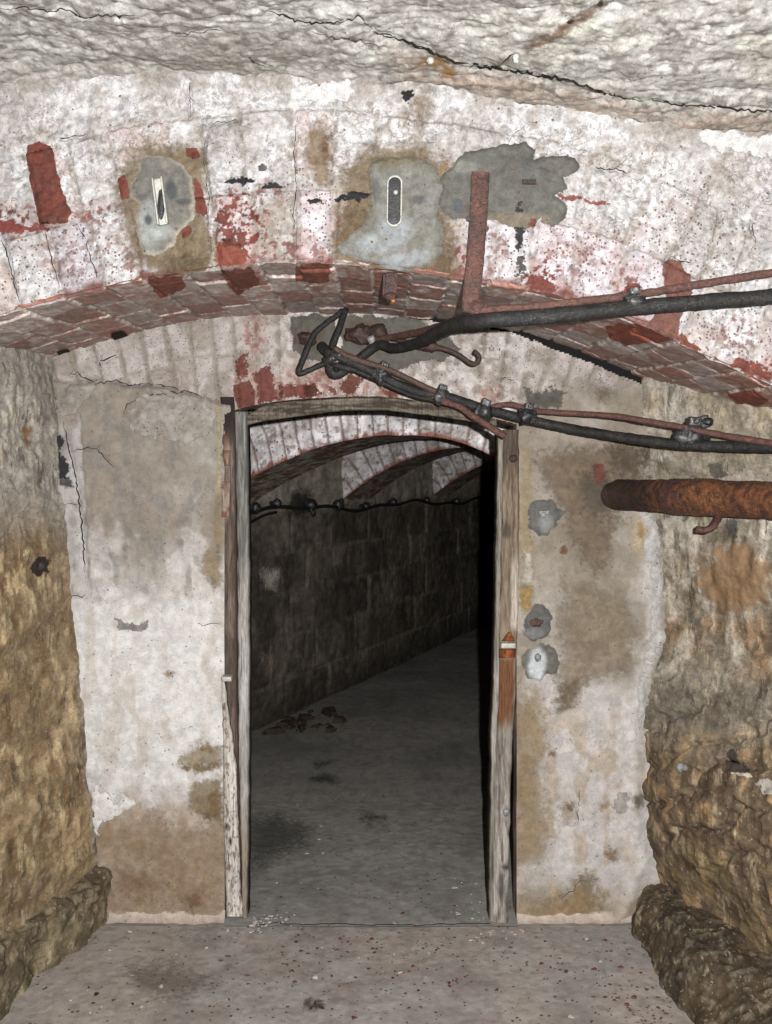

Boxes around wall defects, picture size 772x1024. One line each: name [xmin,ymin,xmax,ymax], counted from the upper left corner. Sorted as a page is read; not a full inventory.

crack [269,11,772,113]
spalling [186,148,201,159]
spalling [0,141,72,235]
spalling [118,174,129,200]
peeling [526,274,559,293]
peeling [662,259,692,297]
crack [68,355,212,412]
peeling [730,357,771,382]
crack [55,398,113,598]
leakage [693,542,772,613]
spalling [114,618,148,631]
leakage [96,746,225,915]